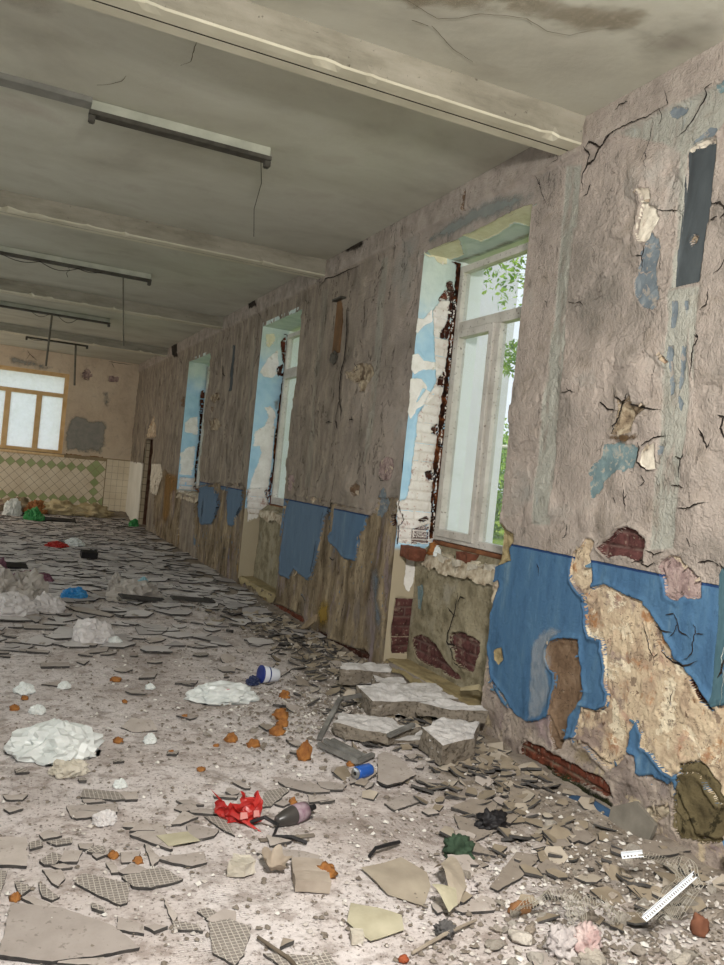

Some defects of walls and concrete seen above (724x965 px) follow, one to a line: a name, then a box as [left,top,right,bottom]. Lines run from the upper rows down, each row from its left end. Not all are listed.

crack [407,0,608,61]
crack [581,84,710,196]
flaking render [633,188,659,242]
crack [690,334,698,380]
crack [600,395,660,433]
crack [698,415,724,448]
flaking render [150,464,162,495]
crack [613,436,708,511]
peeling [178,281,724,871]
crack [631,550,660,567]
crack [644,613,702,667]